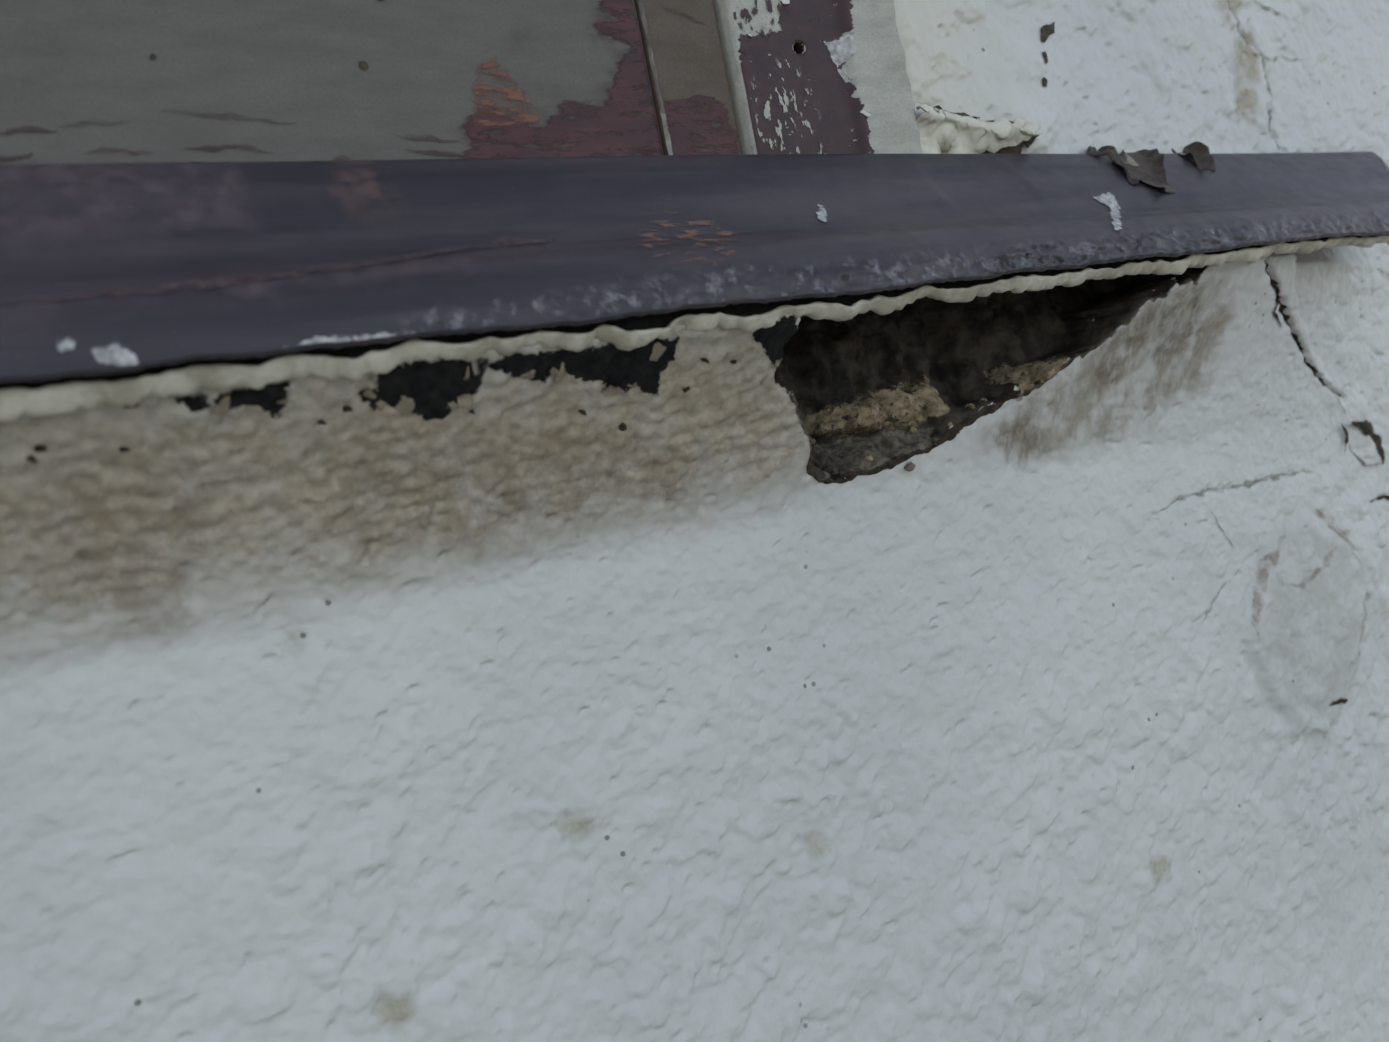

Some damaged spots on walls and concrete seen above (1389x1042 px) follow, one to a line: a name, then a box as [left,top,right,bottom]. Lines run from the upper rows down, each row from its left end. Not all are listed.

peeling [461,0,874,159]
peeling [916,102,1042,154]
peeling [967,192,1170,274]
peeling [57,338,75,352]
peeling [92,343,138,366]
peeling [168,381,290,418]
peeling [298,331,395,344]
peeling [342,337,680,421]
spalling [752,265,1209,484]
crack [1264,261,1344,409]
damp [0,341,799,598]
crack [1175,473,1294,546]